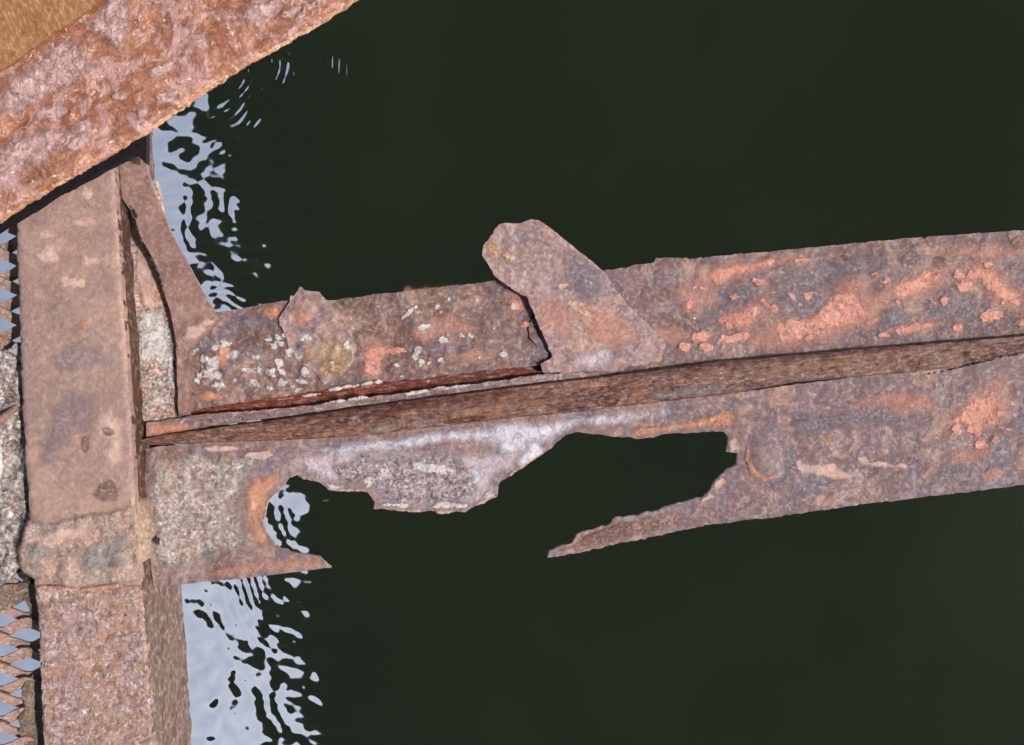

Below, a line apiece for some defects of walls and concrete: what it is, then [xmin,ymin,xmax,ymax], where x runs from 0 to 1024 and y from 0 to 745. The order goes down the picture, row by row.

corrosion [137,245,164,307]
corrosion [186,320,214,338]
crack [510,288,537,347]
corrosion [101,412,126,465]
corrosion [149,423,189,436]
corrosion [264,389,574,428]
corrosion [634,412,733,435]
corrosion [94,480,118,501]
corrosion [249,476,276,542]
peeling [329,461,371,491]
peeling [386,474,468,514]
corrosion [37,529,82,546]